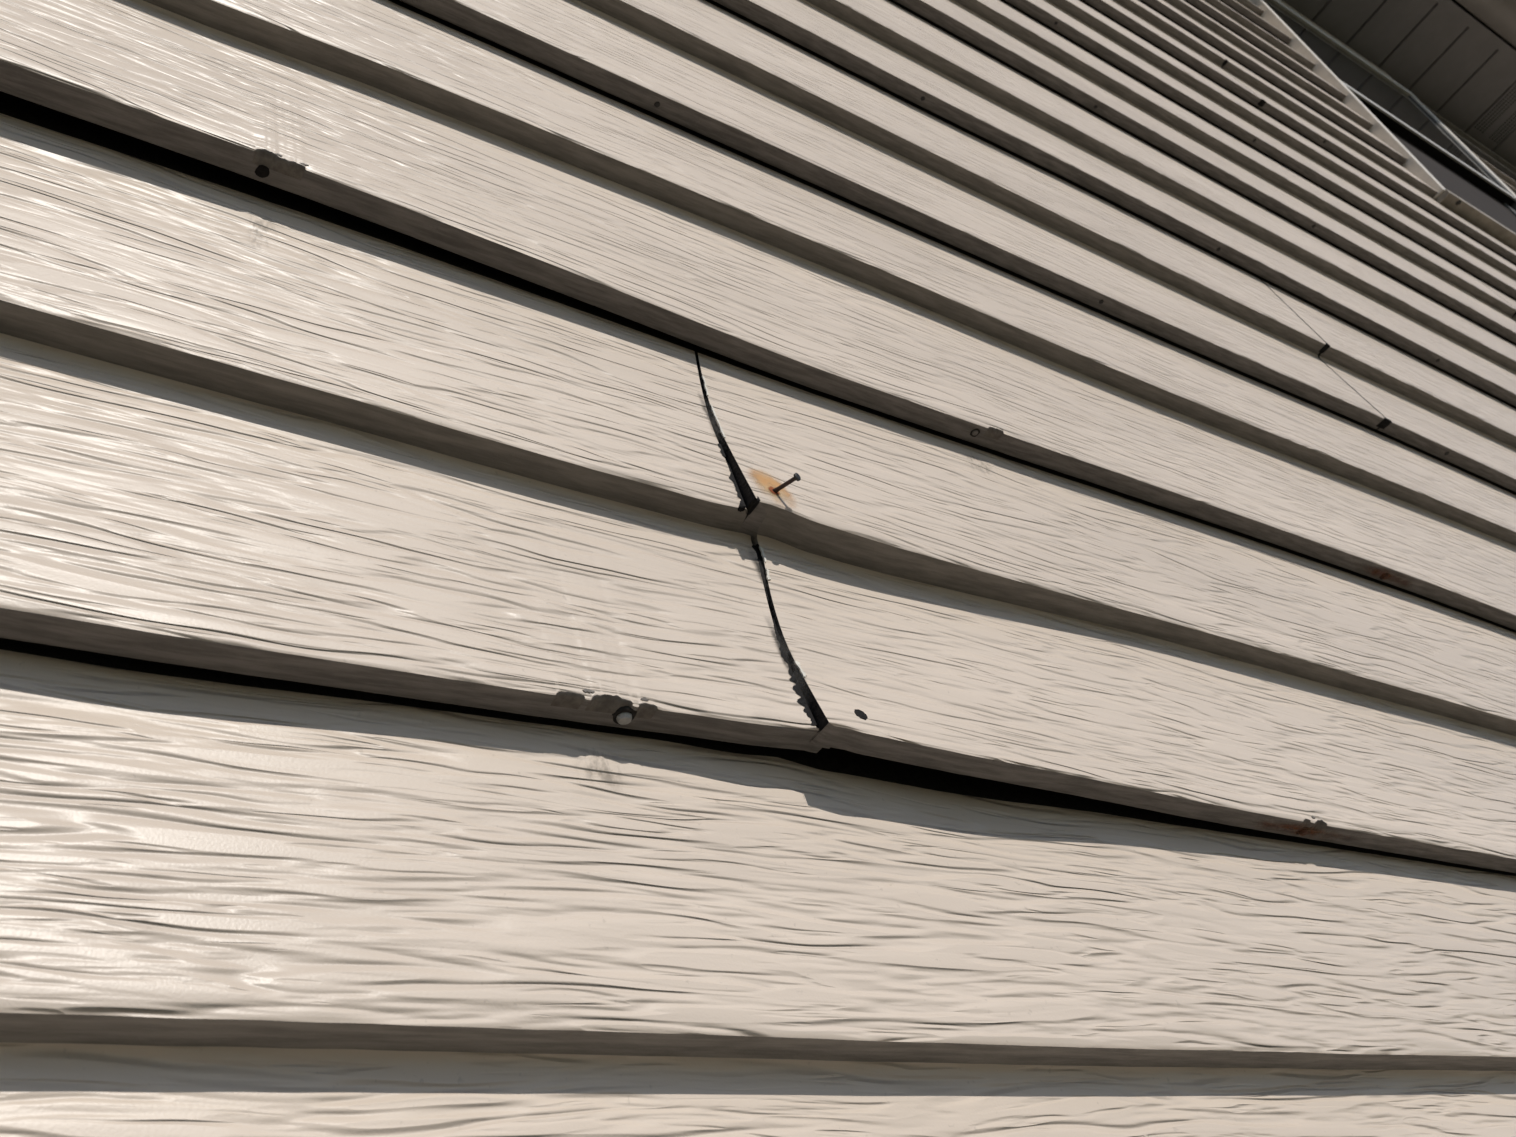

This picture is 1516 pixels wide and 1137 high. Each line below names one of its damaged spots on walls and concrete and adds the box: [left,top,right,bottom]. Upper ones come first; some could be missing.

crack [695,353,827,742]
corrosion [753,471,790,497]